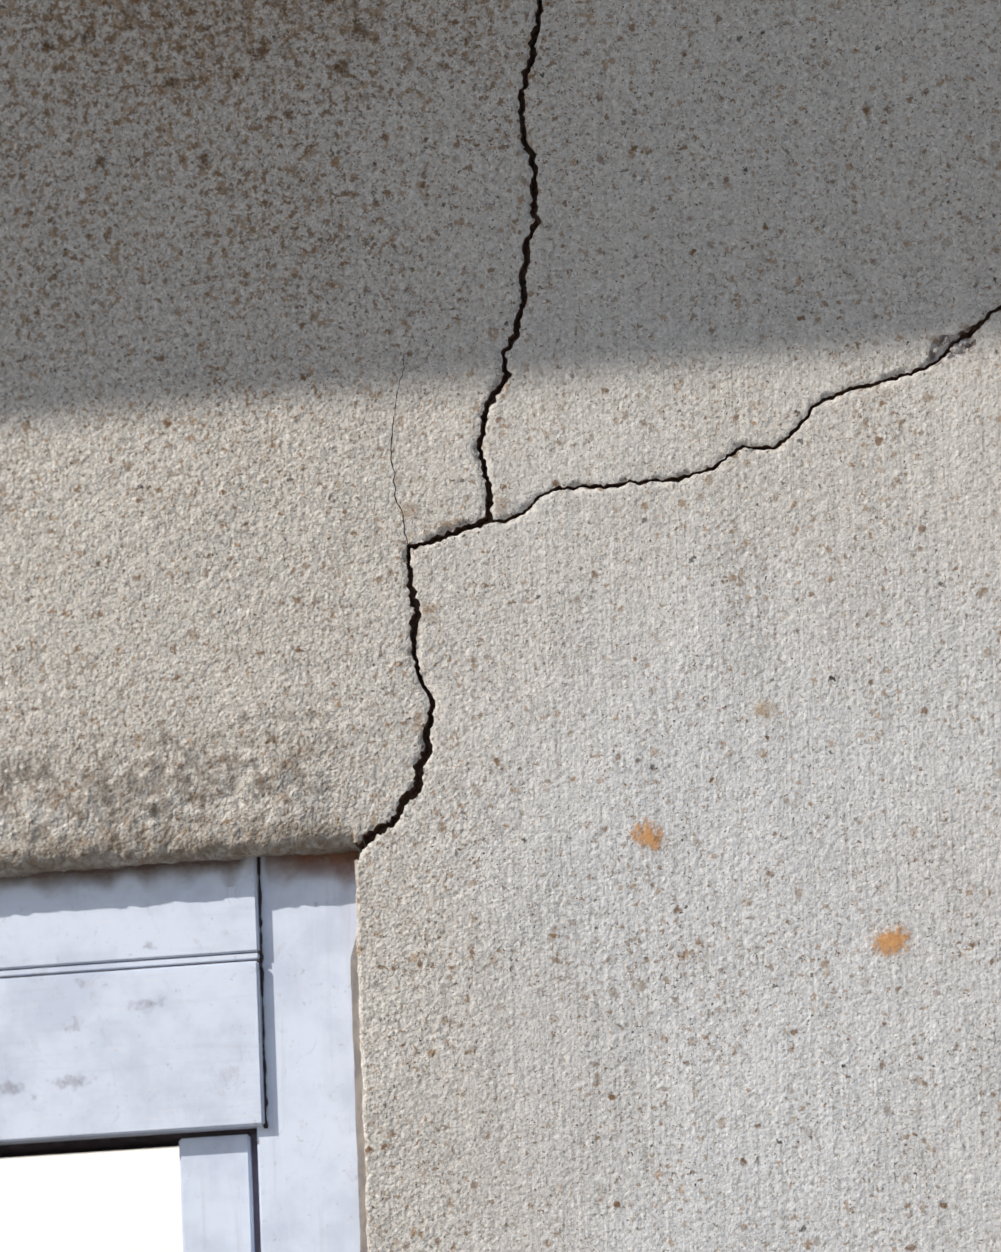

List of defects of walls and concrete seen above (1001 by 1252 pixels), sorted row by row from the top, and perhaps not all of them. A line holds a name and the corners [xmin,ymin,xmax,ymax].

crack [358,0,1001,849]
corrosion [631,822,662,849]
corrosion [872,927,909,957]